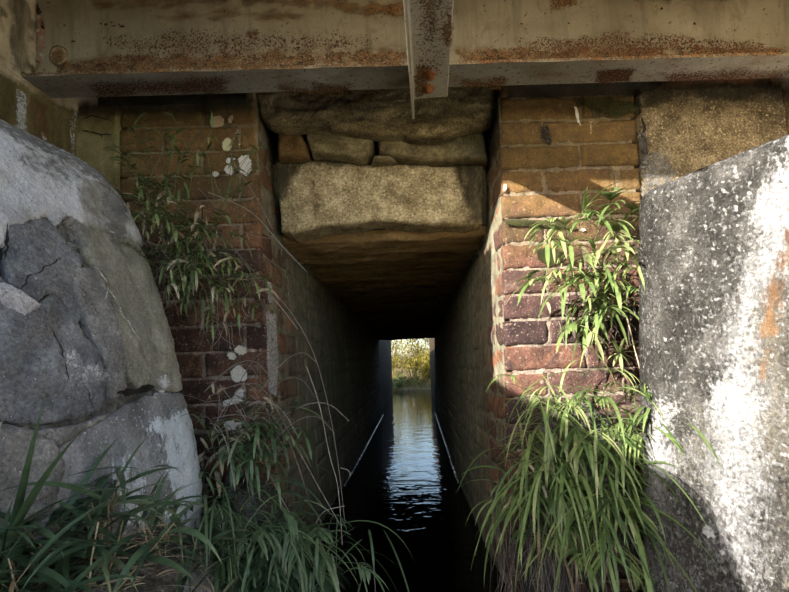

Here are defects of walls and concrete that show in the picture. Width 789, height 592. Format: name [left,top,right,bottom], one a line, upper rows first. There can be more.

rust [21,21,406,99]
rust [244,0,789,97]
leakage [639,82,789,592]